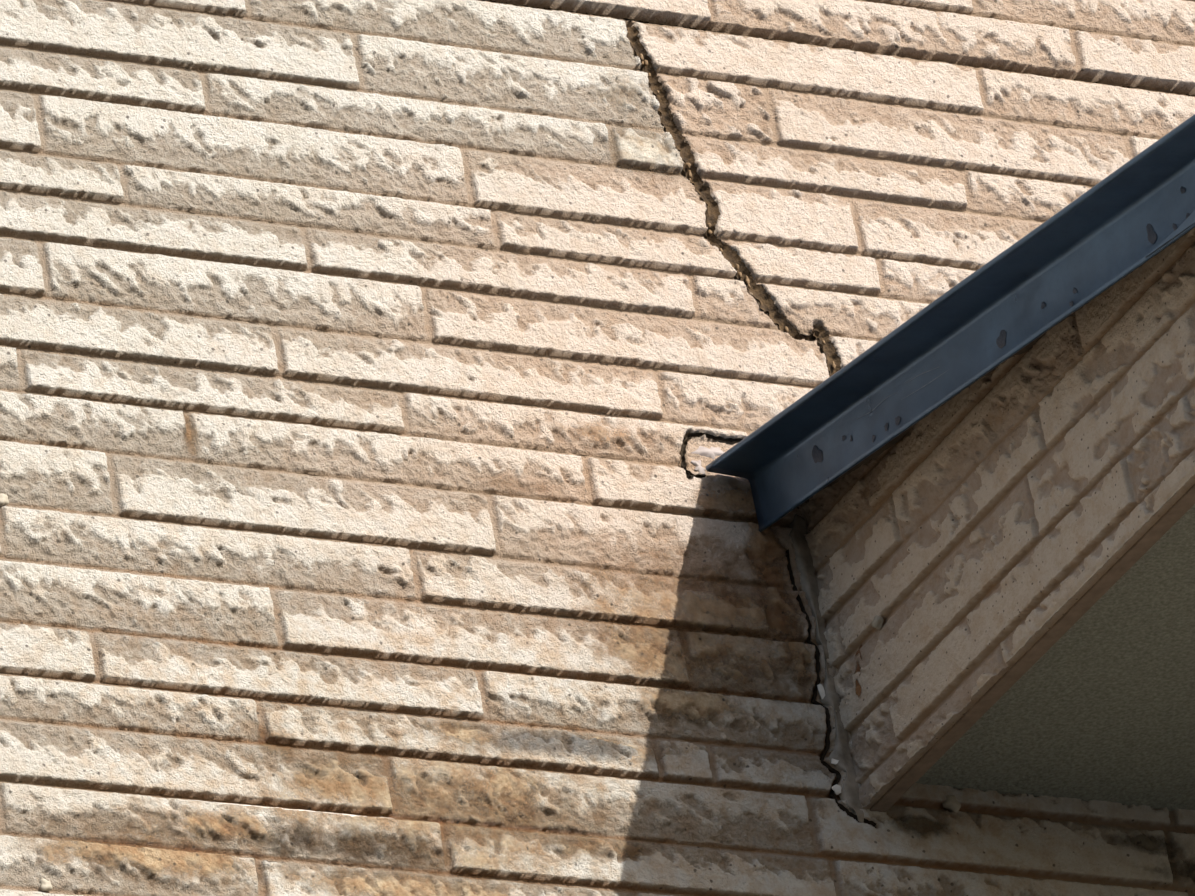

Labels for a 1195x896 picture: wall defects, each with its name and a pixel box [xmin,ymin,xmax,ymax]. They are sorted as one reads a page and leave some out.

crack [627,25,841,376]
crack [680,432,743,479]
crack [786,549,877,828]